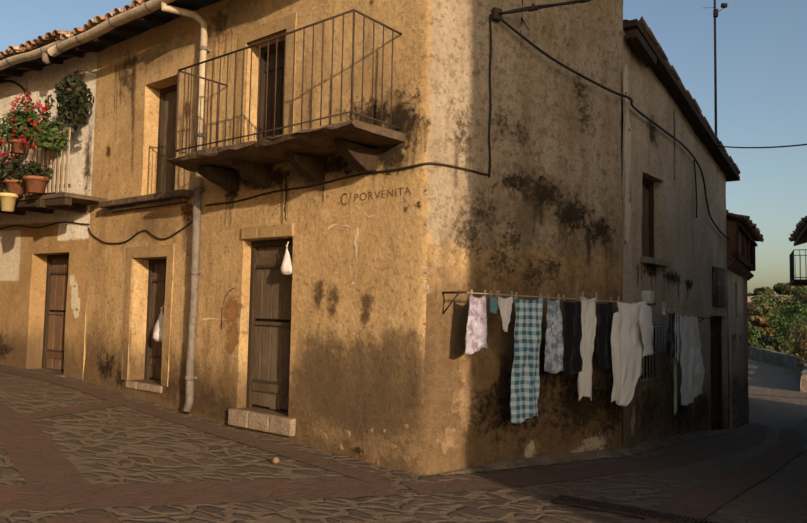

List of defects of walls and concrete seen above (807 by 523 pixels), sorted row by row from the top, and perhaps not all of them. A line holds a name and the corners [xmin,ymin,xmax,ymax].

water stain [343,90,428,175]
water stain [493,172,616,245]
peeling [69,273,81,319]
spalling [224,299,242,354]
water stain [314,281,339,315]
water stain [361,294,375,324]